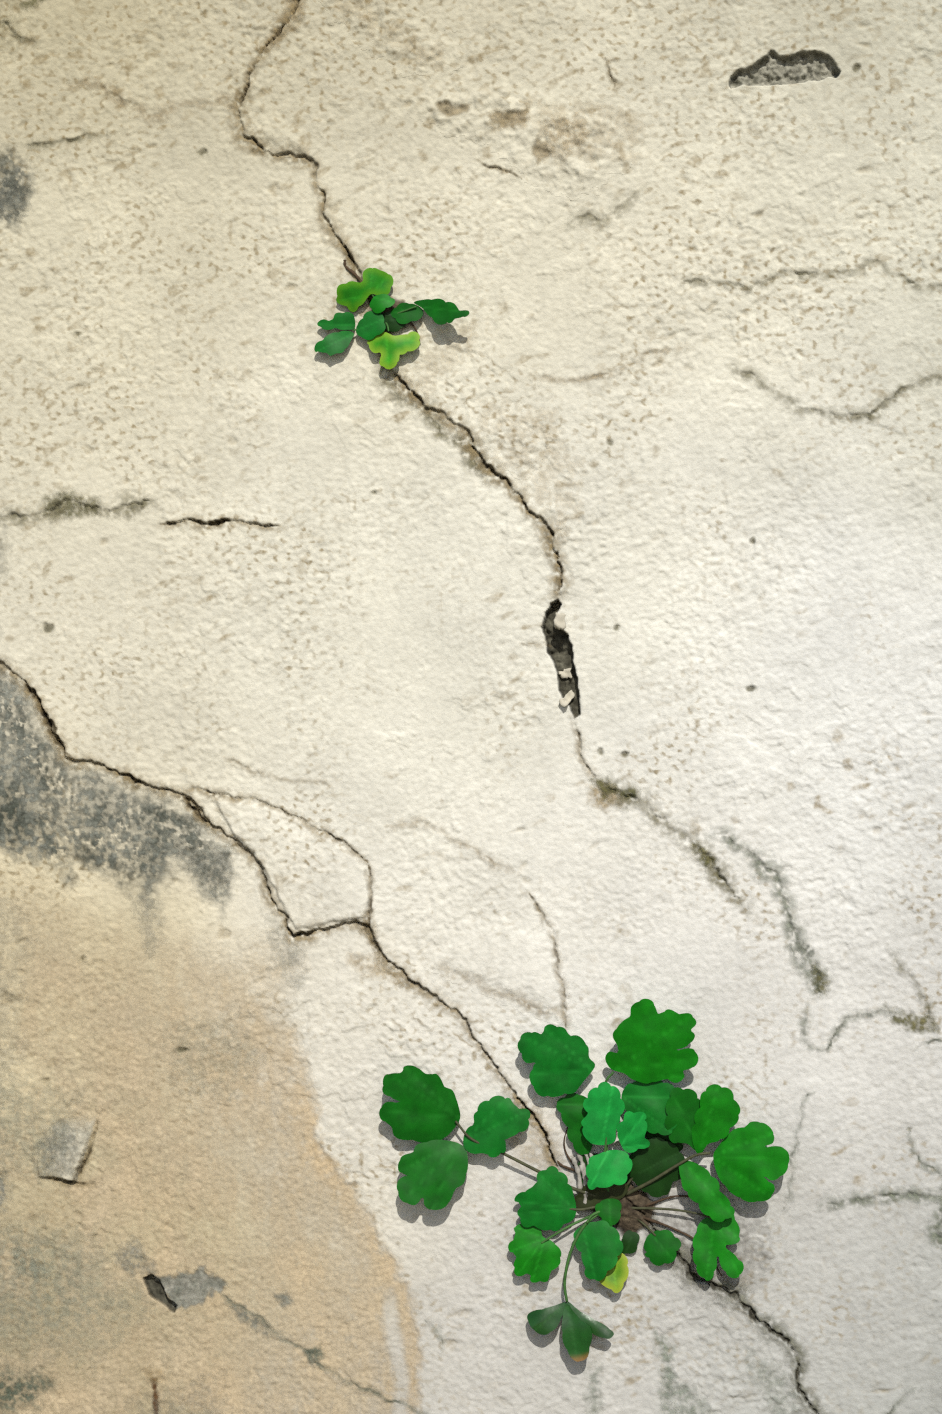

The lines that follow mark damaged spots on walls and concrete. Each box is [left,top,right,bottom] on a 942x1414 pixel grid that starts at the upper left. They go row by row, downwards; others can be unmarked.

crack [235,0,370,299]
spalling [729,51,859,88]
crack [11,499,277,528]
crack [384,369,563,603]
damp [0,668,229,898]
crack [0,662,558,1166]
crack [596,780,827,992]
crack [828,1004,941,1049]
peeling [47,1122,94,1185]
spalling [144,1267,225,1312]
damp [0,971,416,1414]
crack [651,1225,820,1414]